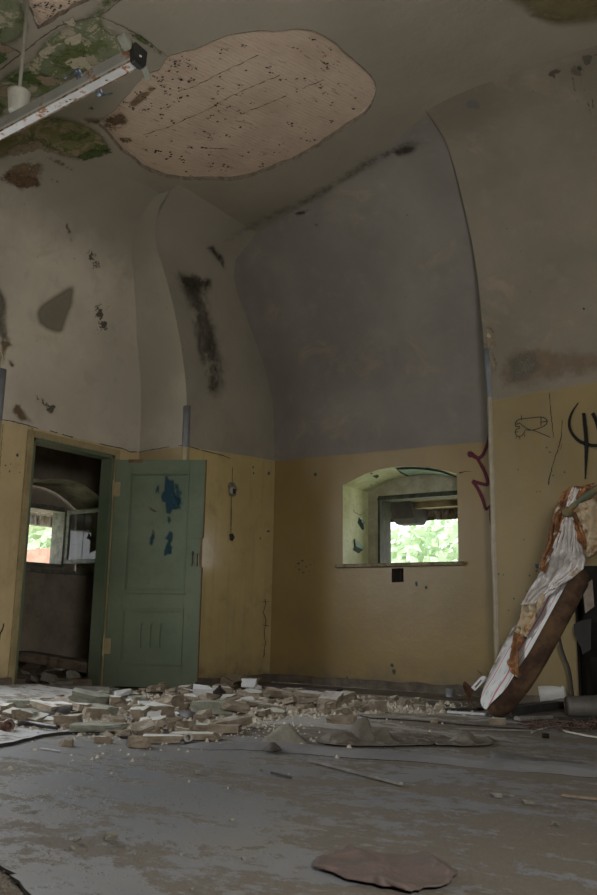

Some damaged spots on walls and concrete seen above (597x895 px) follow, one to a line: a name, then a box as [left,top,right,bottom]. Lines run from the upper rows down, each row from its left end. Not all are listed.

spalling [29,0,89,29]
water stain [0,117,112,189]
spalling [98,29,376,181]
water stain [181,276,218,391]